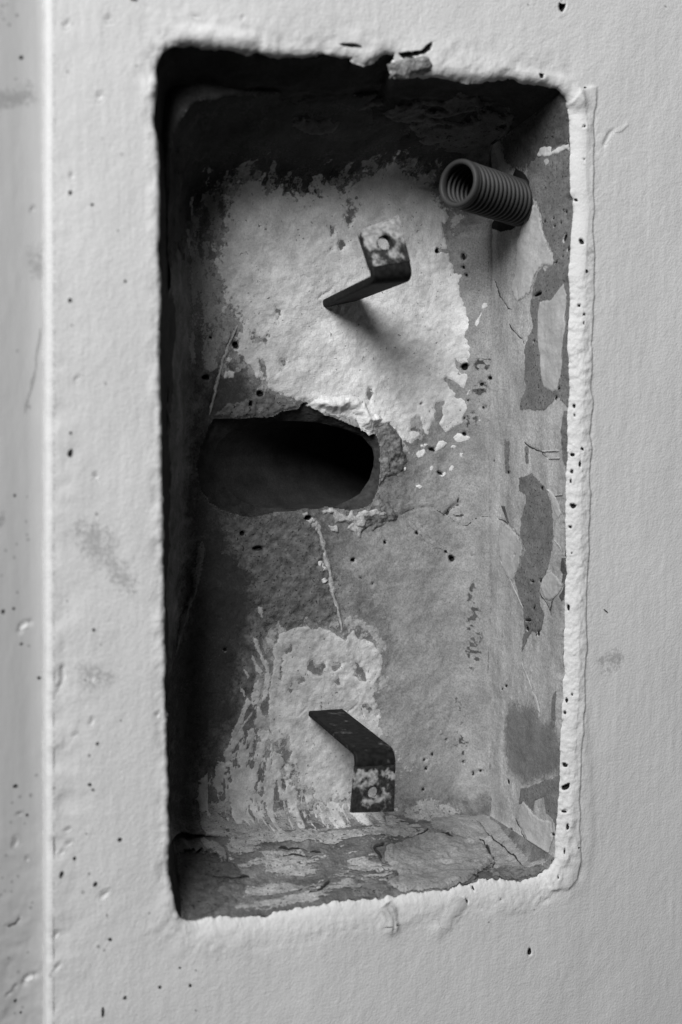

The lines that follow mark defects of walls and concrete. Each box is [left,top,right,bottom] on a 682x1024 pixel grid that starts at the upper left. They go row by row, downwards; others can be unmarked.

spalling [399,43,432,59]
peeling [512,134,573,466]
spalling [214,393,300,419]
spalling [211,422,470,629]
peeling [498,473,567,650]
peeling [531,691,556,728]
peeling [518,775,560,853]
crack [373,843,384,858]
crack [473,818,525,880]
peeling [175,849,244,921]
peeling [255,881,301,908]
spalling [351,872,397,898]